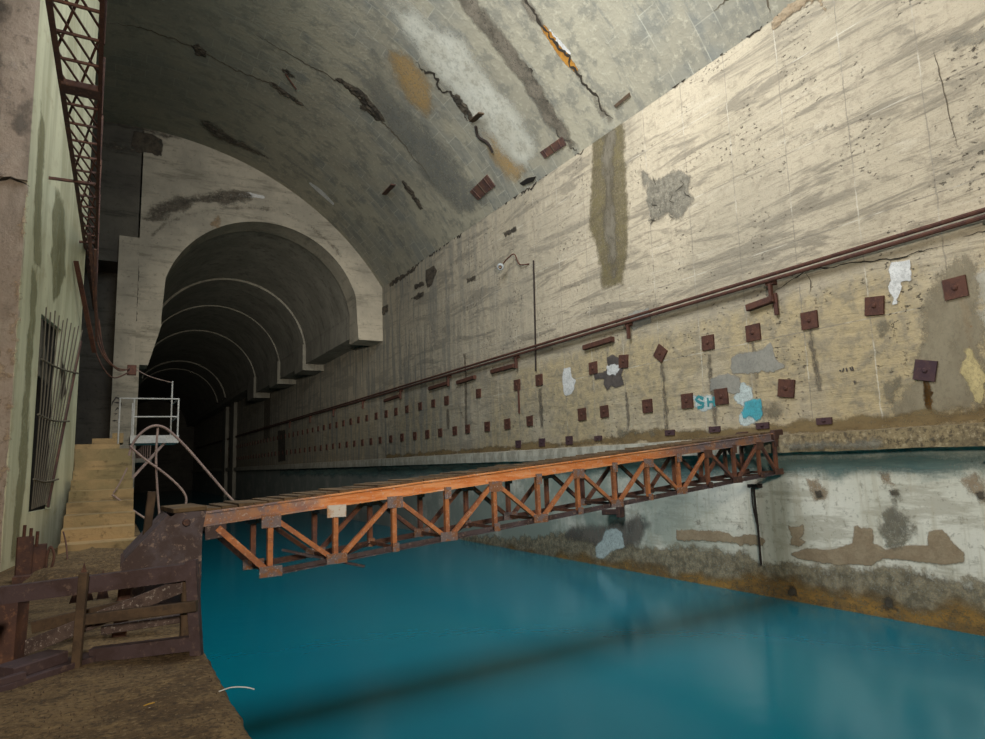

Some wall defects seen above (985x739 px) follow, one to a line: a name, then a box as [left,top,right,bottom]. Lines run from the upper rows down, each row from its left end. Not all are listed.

crack [260,37,353,95]
crack [523,0,612,120]
spalling [335,78,385,122]
crack [0,176,30,187]
damp [590,124,628,287]
spalling [642,170,694,225]
crack [765,231,985,297]